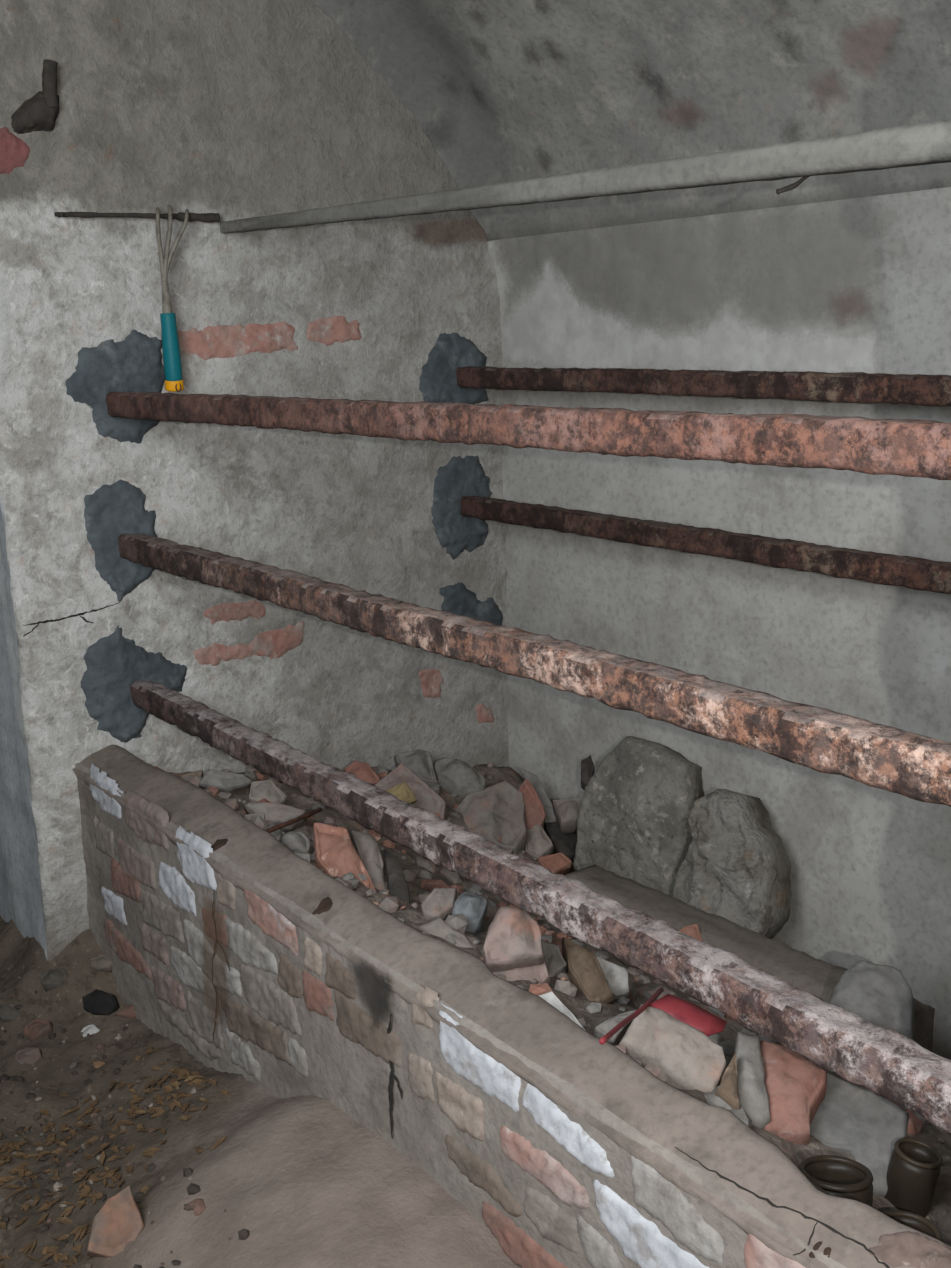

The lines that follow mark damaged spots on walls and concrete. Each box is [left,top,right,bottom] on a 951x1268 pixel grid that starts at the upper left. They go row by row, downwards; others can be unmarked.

corrosion [105,366,951,480]
corrosion [461,496,951,594]
crack [23,603,118,637]
corrosion [118,533,951,807]
corrosion [130,680,951,1135]
crack [386,1014,402,1139]